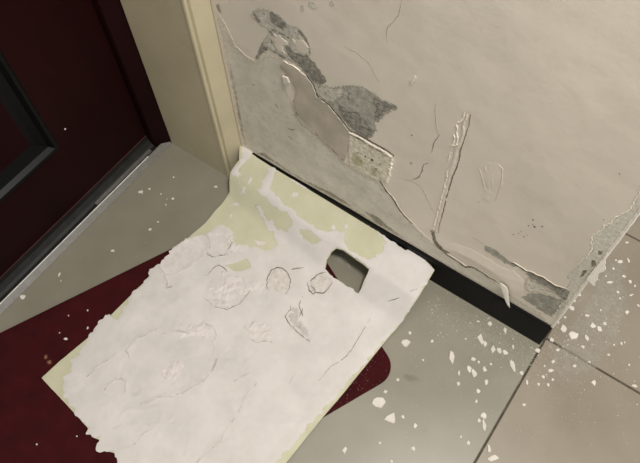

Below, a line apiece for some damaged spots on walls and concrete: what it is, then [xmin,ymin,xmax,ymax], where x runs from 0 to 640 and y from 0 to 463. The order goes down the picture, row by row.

peeling [218,9,640,352]
crack [379,103,496,282]